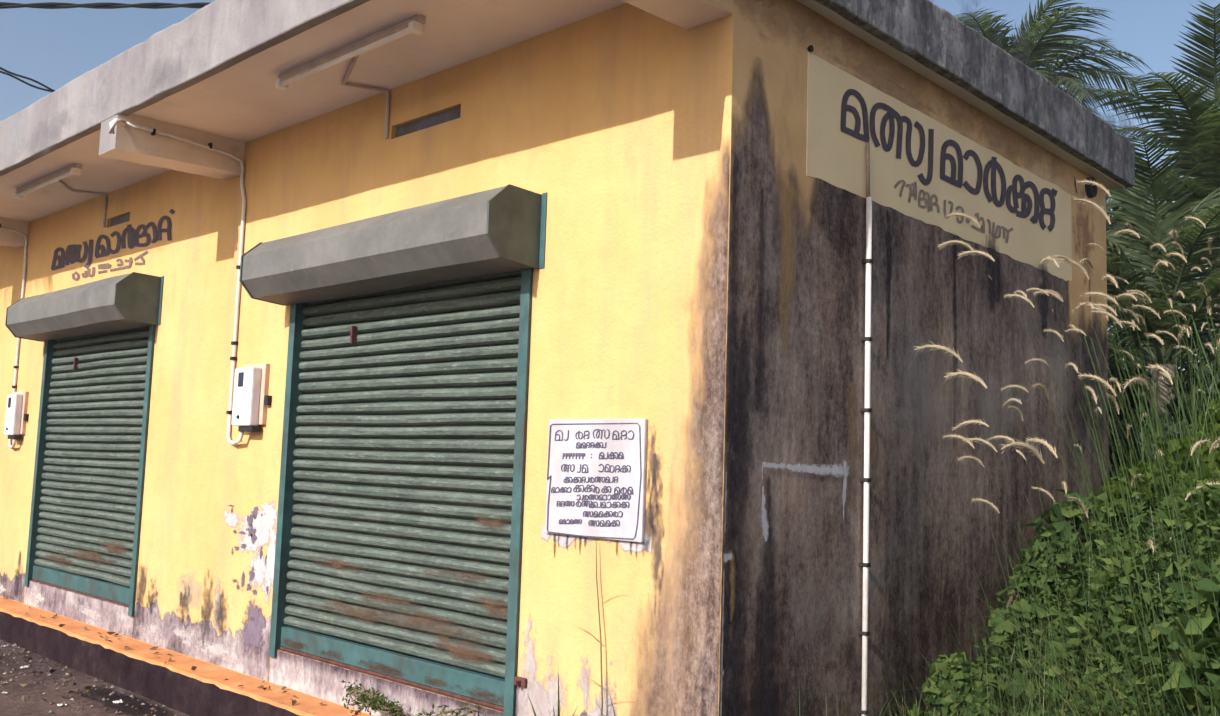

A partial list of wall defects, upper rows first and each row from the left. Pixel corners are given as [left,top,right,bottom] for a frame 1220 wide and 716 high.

leakage [747,0,1058,161]
leakage [640,74,1110,716]
spalling [0,501,616,716]